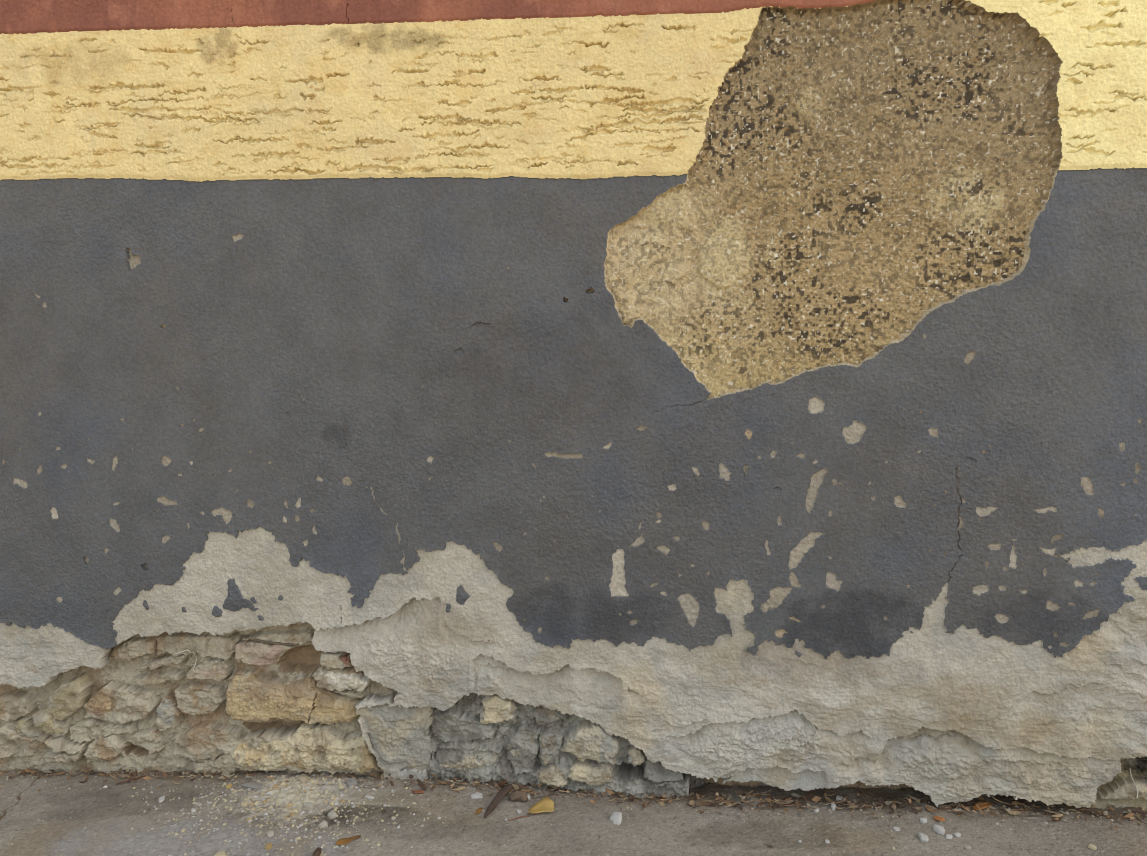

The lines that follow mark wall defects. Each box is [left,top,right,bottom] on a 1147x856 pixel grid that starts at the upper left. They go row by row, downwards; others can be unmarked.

flaking render [604,0,1063,405]
peeling [0,495,1147,809]
crack [948,467,963,582]